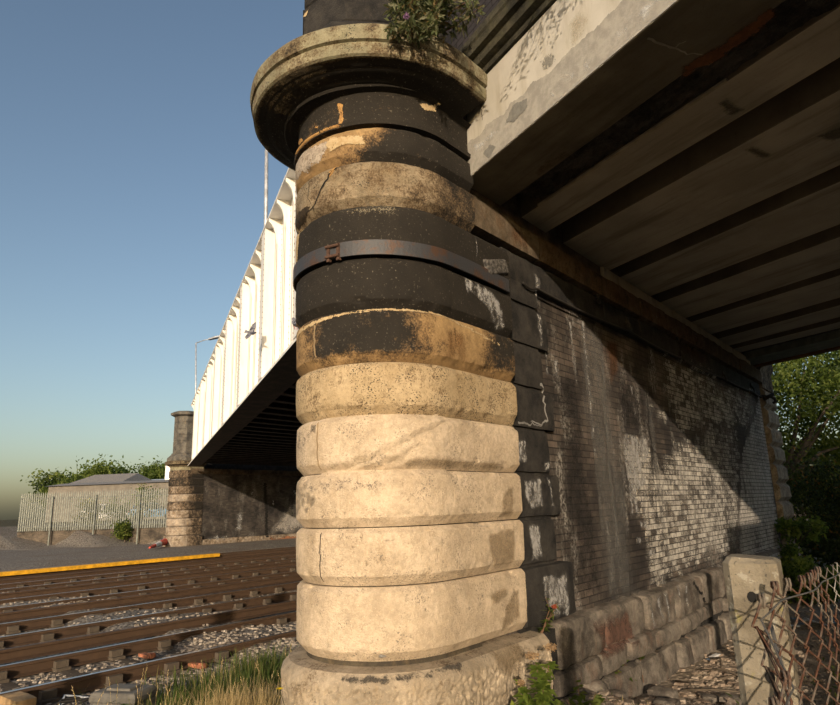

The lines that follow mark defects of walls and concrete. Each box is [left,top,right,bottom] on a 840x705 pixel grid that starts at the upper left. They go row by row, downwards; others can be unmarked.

crack [306,166,340,214]
peeling [294,103,365,185]
peeling [467,0,677,175]
leakage [623,353,783,581]